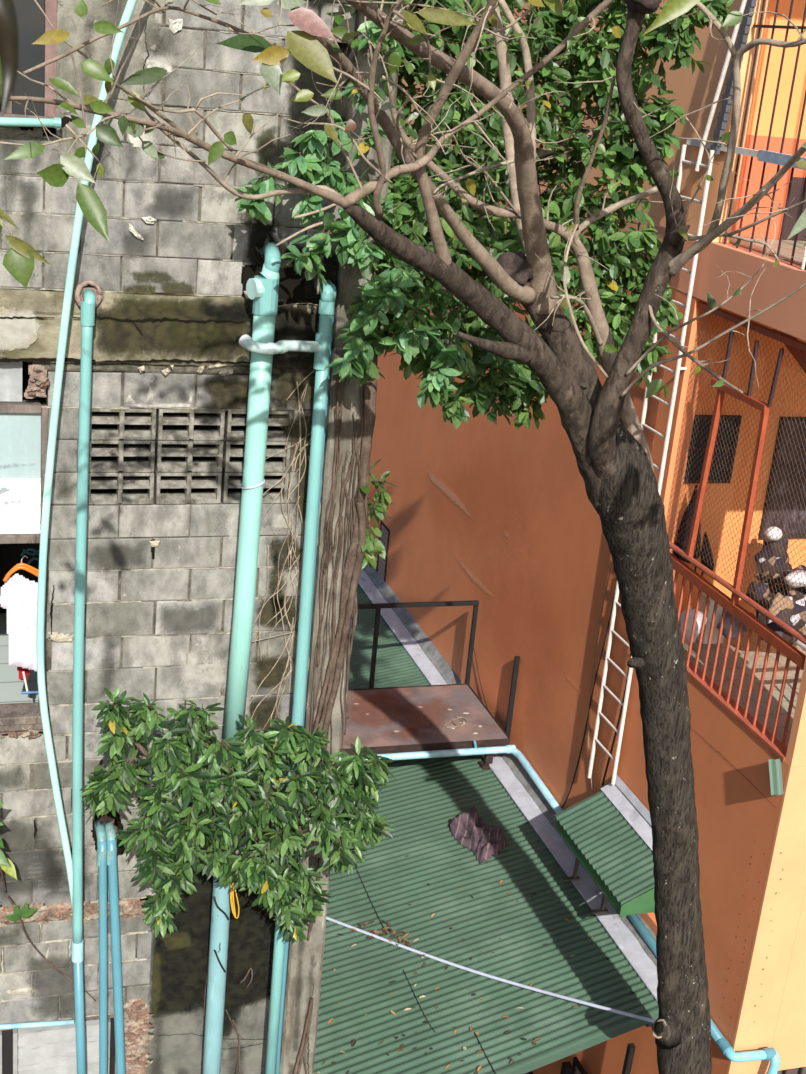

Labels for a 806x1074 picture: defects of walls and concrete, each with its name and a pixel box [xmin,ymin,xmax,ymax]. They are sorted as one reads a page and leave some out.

peeling [0,306,42,351]